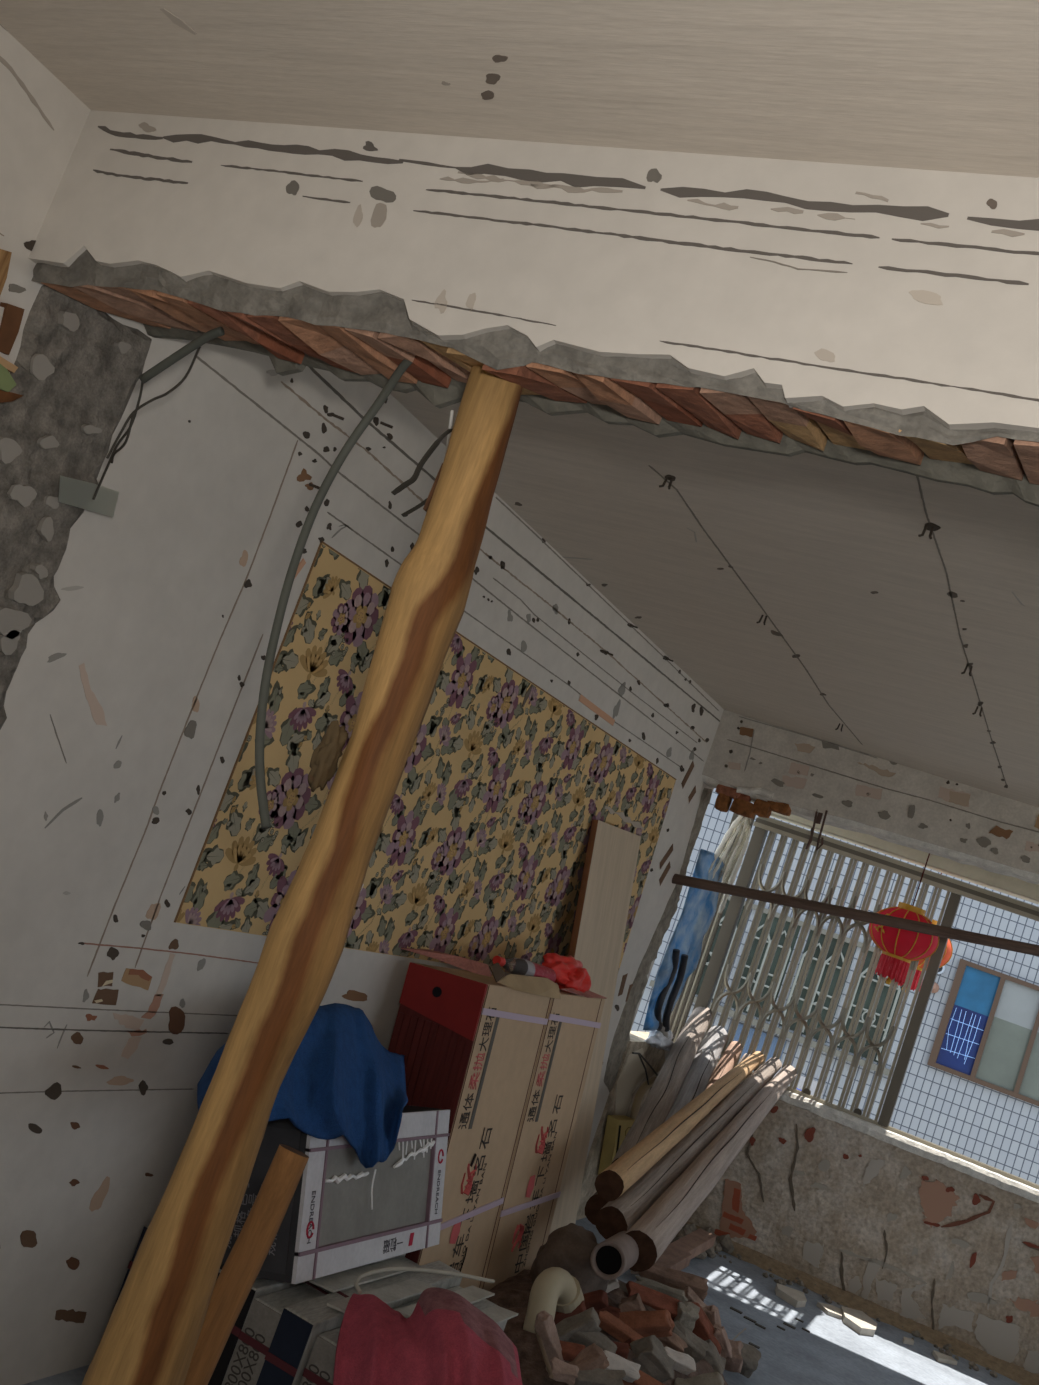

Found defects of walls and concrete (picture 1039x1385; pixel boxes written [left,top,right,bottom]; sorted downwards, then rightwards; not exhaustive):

crack [93,126,1039,285]
flaking render [0,240,1039,730]
crack [464,465,1039,833]
spalling [184,720,197,739]
peeling [740,727,754,737]
flaking render [804,1127,816,1142]
flaking render [714,1179,757,1241]
flaking render [918,1176,981,1228]
peeling [938,1296,1039,1374]